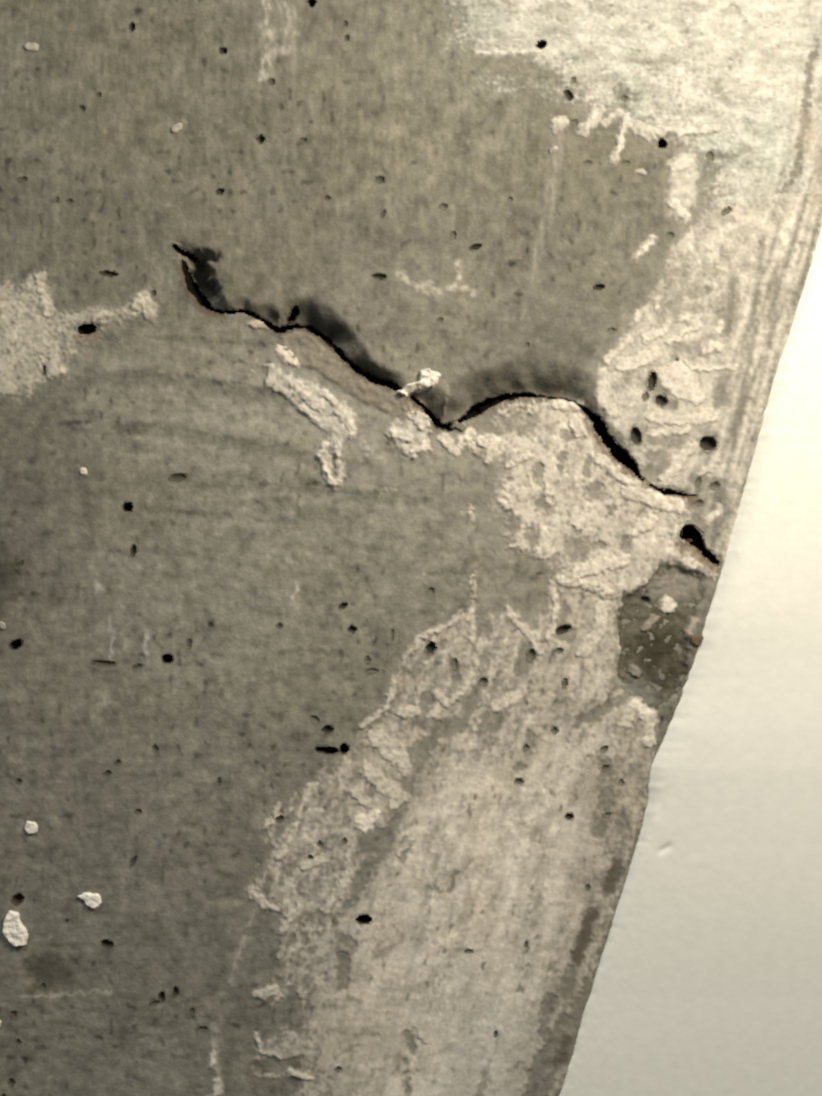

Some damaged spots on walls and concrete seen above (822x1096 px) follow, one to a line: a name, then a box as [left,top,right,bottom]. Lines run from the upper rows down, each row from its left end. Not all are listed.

crack [171,243,721,567]